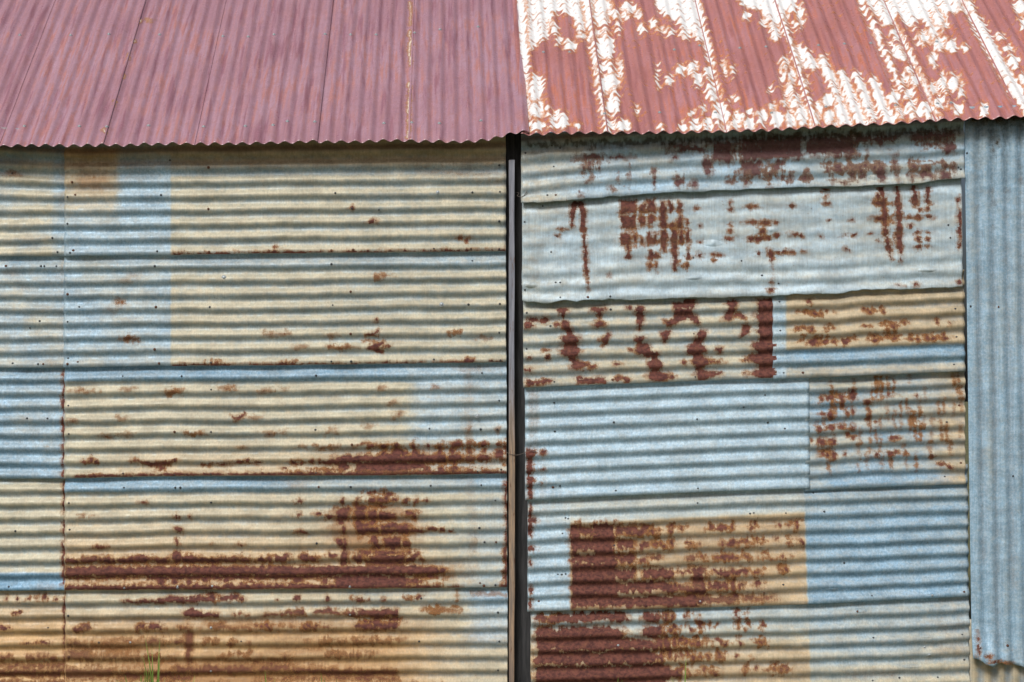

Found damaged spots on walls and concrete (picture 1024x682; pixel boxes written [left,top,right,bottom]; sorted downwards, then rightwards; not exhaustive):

peeling [517,0,1024,134]
rust [555,153,626,284]
rust [611,187,724,271]
rust [666,131,956,264]
rust [524,307,630,387]
rust [626,299,723,382]
rust [722,281,777,378]
rust [795,299,951,346]
rust [811,388,877,460]
rust [0,371,507,682]
rust [528,520,805,682]